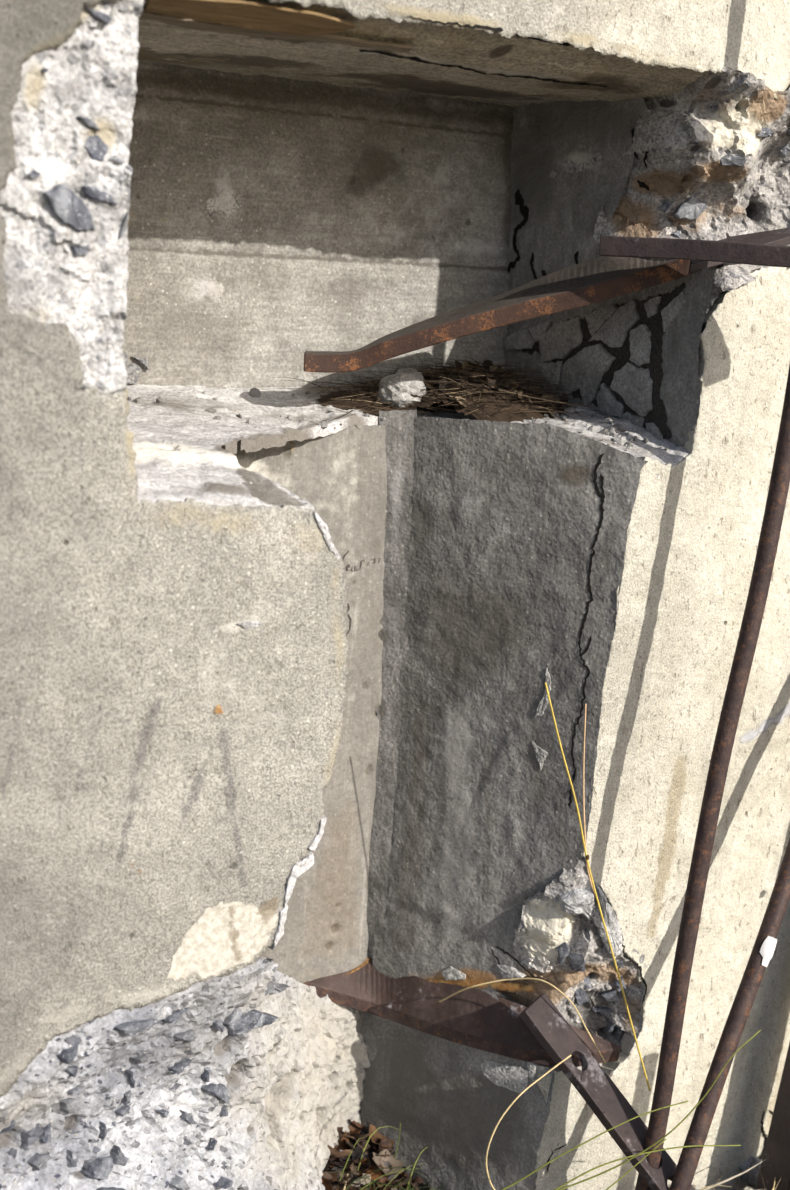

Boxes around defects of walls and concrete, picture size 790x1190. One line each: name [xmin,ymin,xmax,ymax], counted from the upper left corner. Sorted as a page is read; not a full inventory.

spalling [0,0,148,393]
crack [507,189,546,279]
crack [503,283,685,441]
spalling [593,67,790,243]
spalling [704,263,772,321]
crack [568,453,605,808]
damp [742,703,790,741]
spalling [0,815,371,1190]
peeling [442,967,466,981]
rust [427,979,534,992]
peeling [481,1060,559,1094]
spalling [496,856,647,1052]